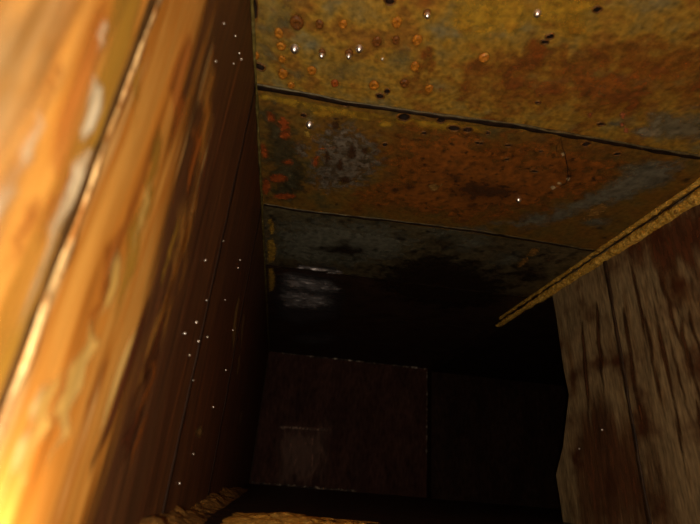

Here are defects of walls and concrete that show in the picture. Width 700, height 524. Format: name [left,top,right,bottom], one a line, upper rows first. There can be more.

rust [451,0,527,40]
rust [261,95,624,223]